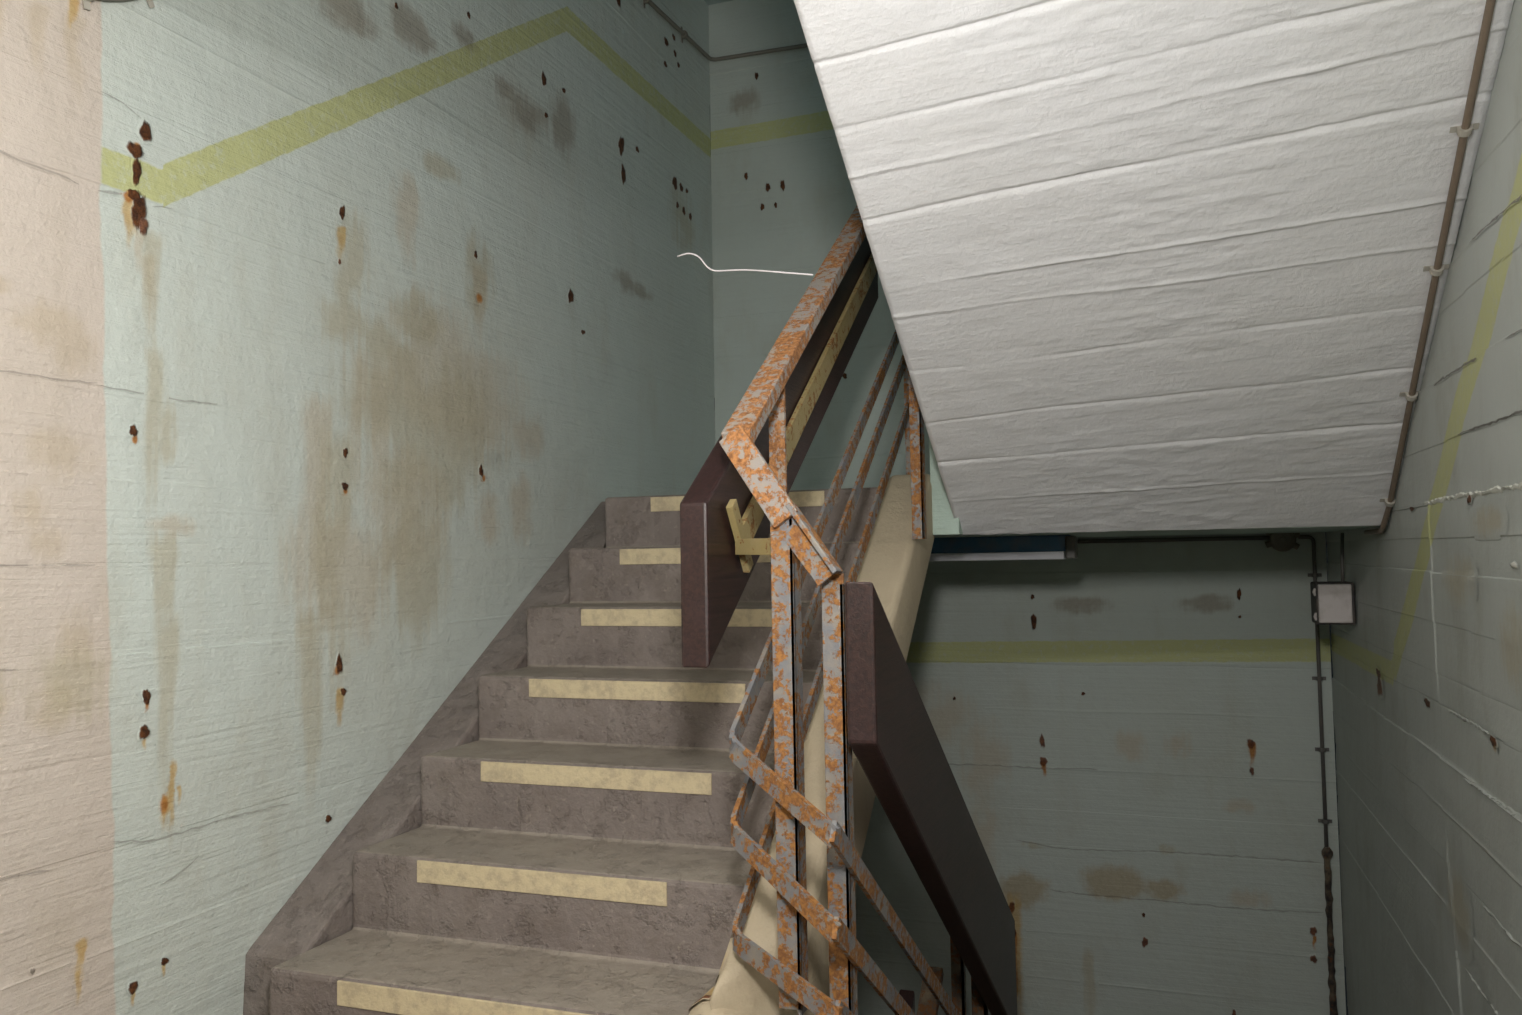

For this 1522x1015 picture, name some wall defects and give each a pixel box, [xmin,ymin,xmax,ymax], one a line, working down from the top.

damp [302,0,579,172]
corrosion [119,116,168,348]
crack [0,370,215,405]
damp [272,142,548,818]
damp [136,343,200,858]
corrosion [333,649,348,729]
corrosion [159,758,184,830]
damp [912,674,1196,916]
corrosion [1245,737,1259,778]
corrosion [70,935,93,1010]
corrosion [1002,891,1028,1015]